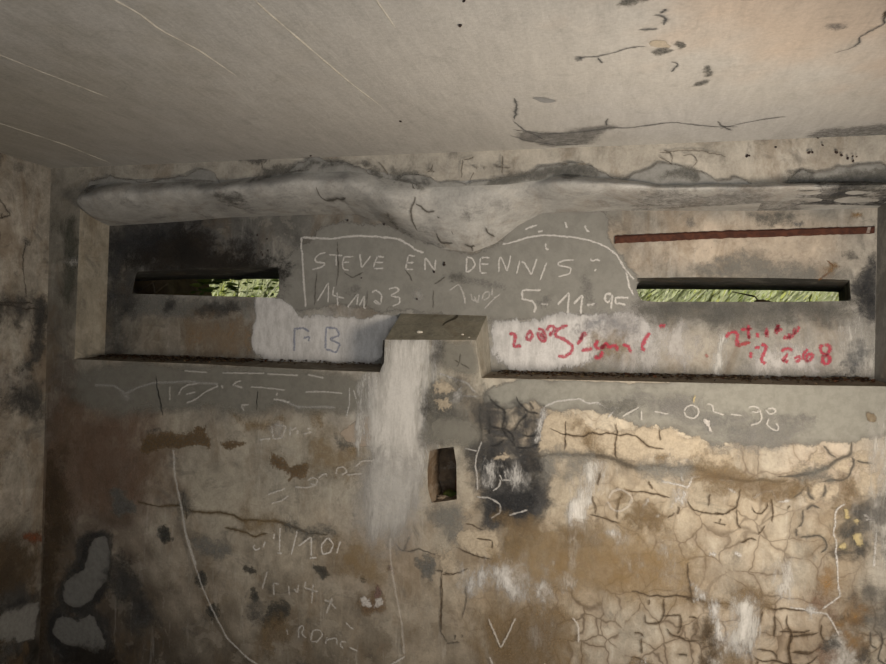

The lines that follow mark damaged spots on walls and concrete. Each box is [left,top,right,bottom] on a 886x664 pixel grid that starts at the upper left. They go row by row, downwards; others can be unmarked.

crack [839,12,886,52]
crack [513,98,779,147]
crack [660,149,725,165]
crack [410,165,494,251]
water stain [0,295,47,421]
crack [139,491,336,540]
water stain [341,340,886,664]
crack [539,443,871,553]
water stain [313,564,329,579]
crack [633,564,731,664]
crack [747,607,830,664]
crack [865,632,886,664]